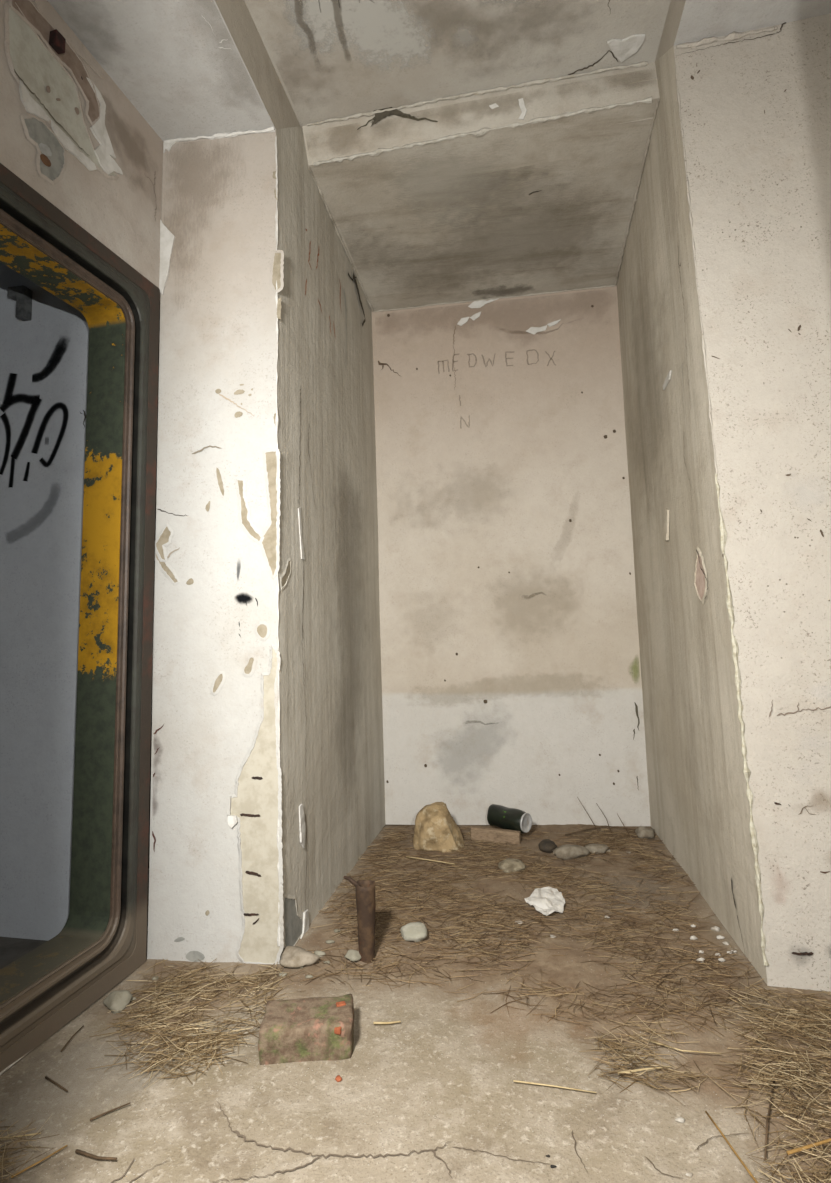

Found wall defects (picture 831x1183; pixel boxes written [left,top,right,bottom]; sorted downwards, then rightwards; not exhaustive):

peeling [4,0,123,185]
peeling [458,299,498,326]
peeling [526,319,561,335]
peeling [216,449,292,591]
peeling [154,524,194,586]
peeling [210,671,226,696]
spalling [226,621,309,965]
crack [111,1159,168,1183]
crack [213,1103,549,1182]
crack [572,1130,588,1173]